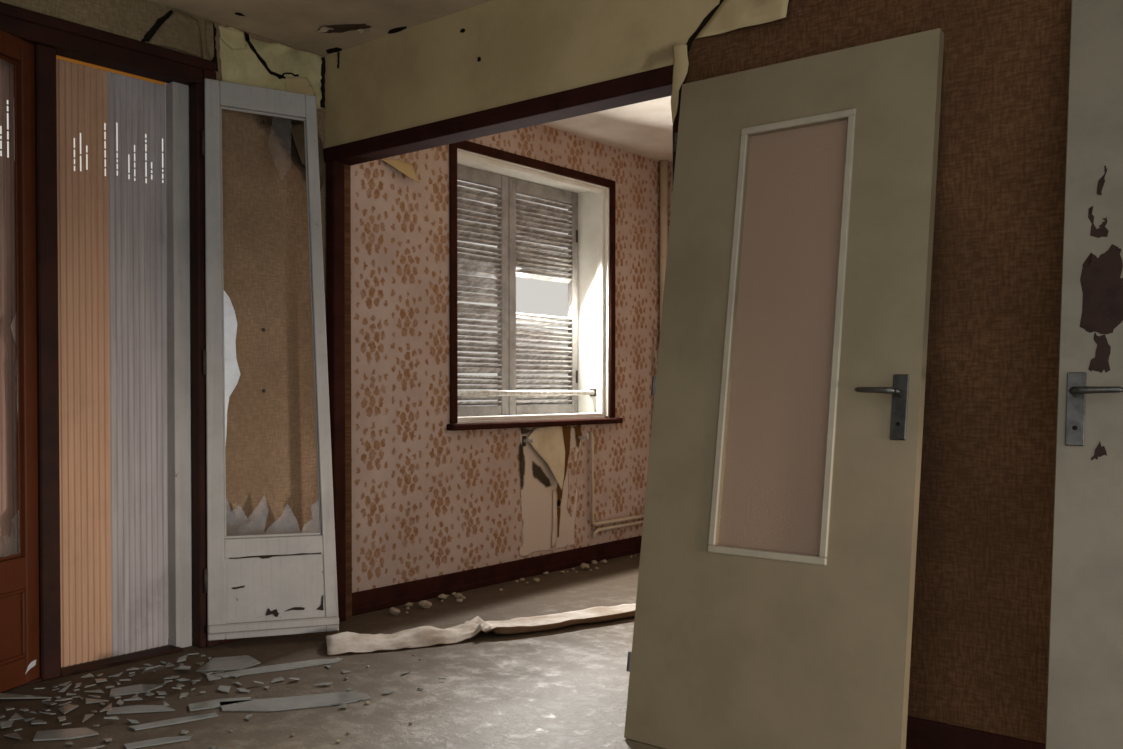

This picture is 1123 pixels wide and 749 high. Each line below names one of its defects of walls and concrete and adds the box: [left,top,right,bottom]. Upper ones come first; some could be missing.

crack [244,32,340,108]
flaking render [519,427,582,556]